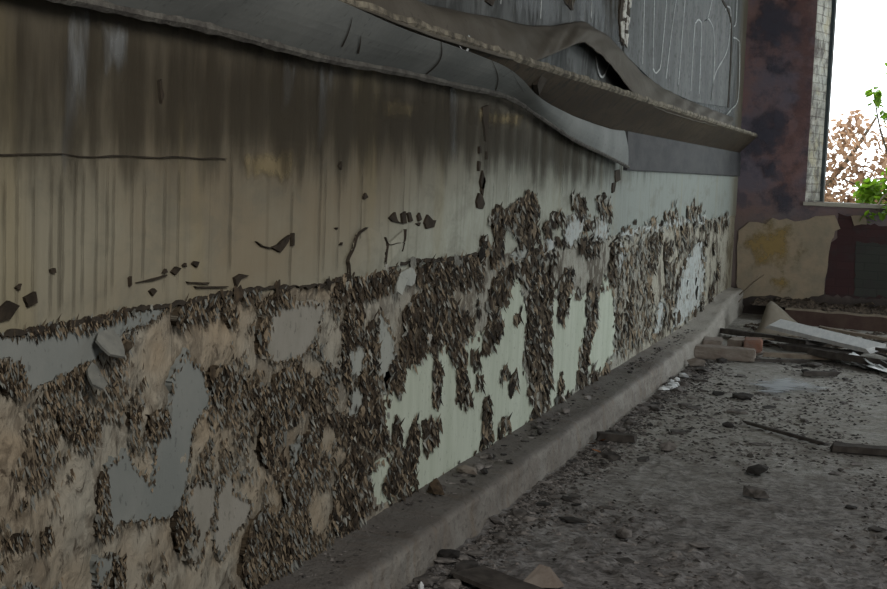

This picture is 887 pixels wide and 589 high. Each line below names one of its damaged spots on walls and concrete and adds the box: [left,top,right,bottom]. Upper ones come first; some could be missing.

spalling [616,0,632,48]
flaking render [736,213,887,300]
peeling [0,105,730,589]